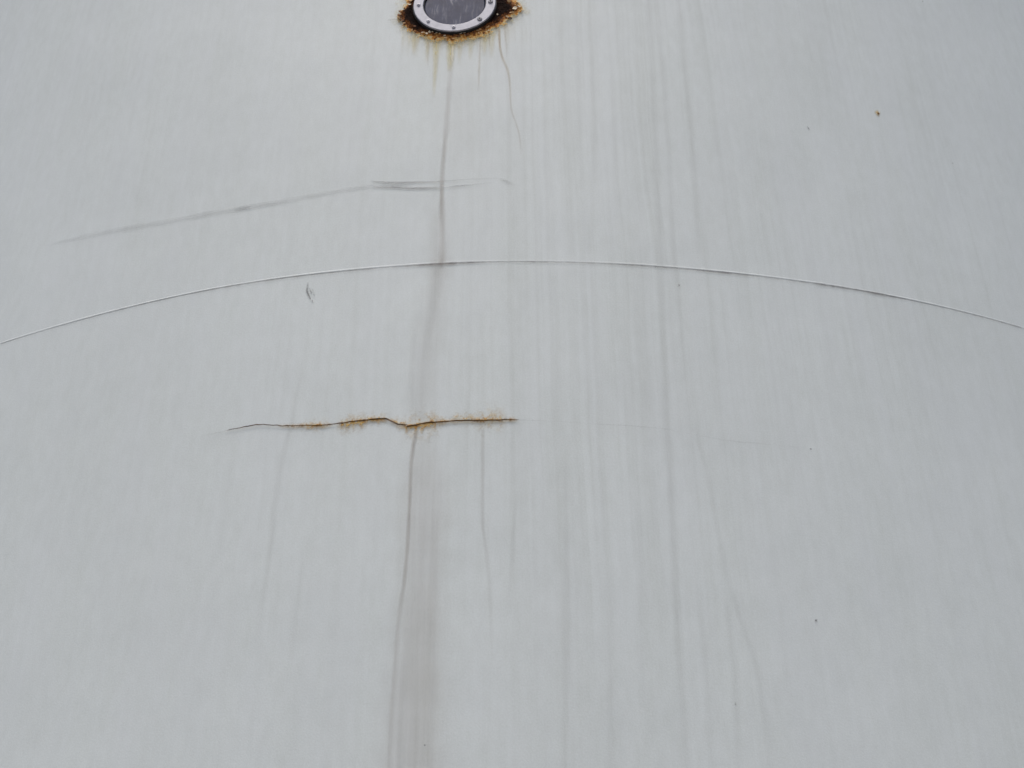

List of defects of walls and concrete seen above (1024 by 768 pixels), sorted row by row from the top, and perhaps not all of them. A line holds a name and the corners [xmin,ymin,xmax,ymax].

corrosion [397,0,523,58]
crack [229,417,519,430]